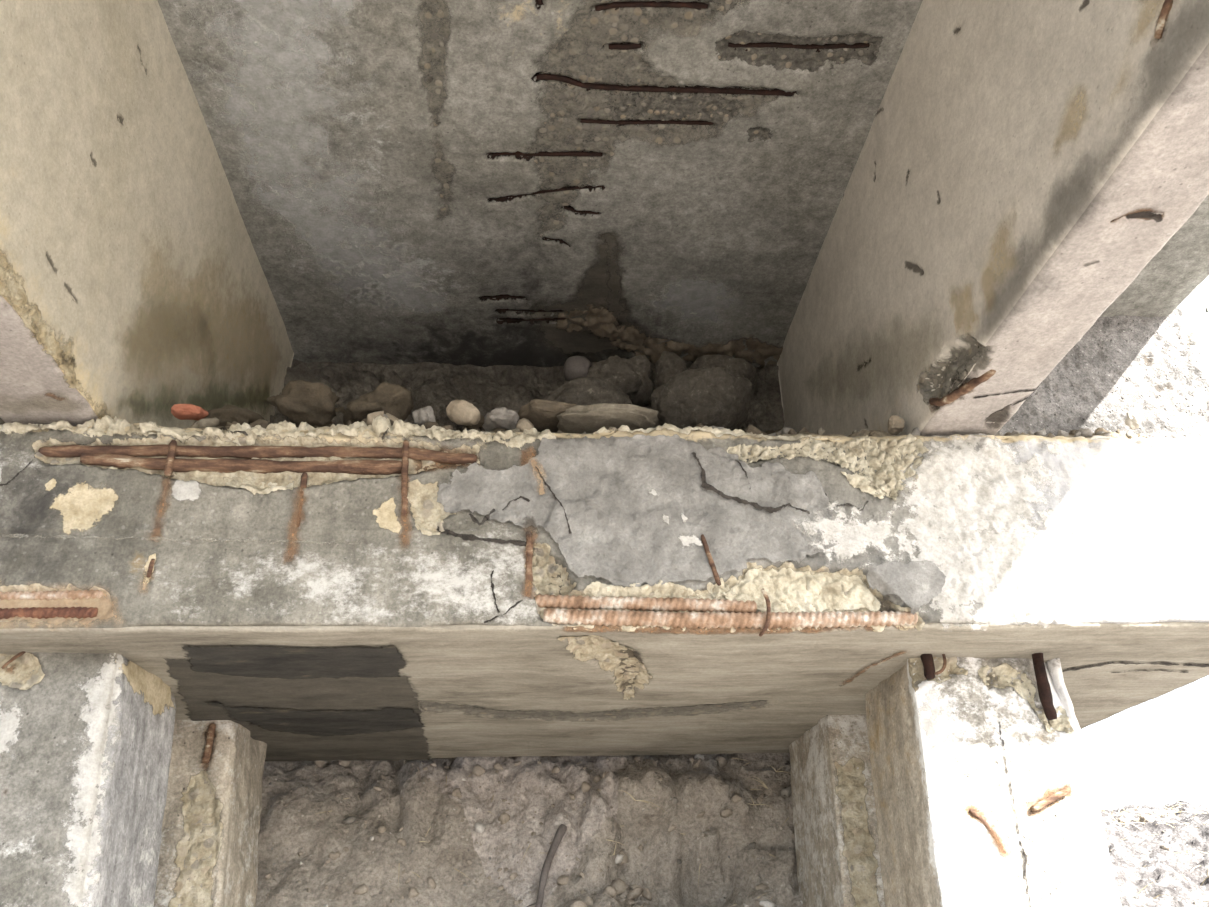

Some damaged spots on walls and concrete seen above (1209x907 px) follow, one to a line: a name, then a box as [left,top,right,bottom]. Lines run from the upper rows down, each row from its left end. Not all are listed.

spalling [487,0,797,247]
spalling [715,30,883,72]
spalling [0,249,841,590]
crack [692,452,868,514]
spalling [917,334,996,409]
spalling [0,583,117,626]
crack [483,571,522,623]
spalling [418,405,1065,722]
spalling [833,757,880,907]
peeling [908,653,1074,907]
crack [999,722,1031,907]